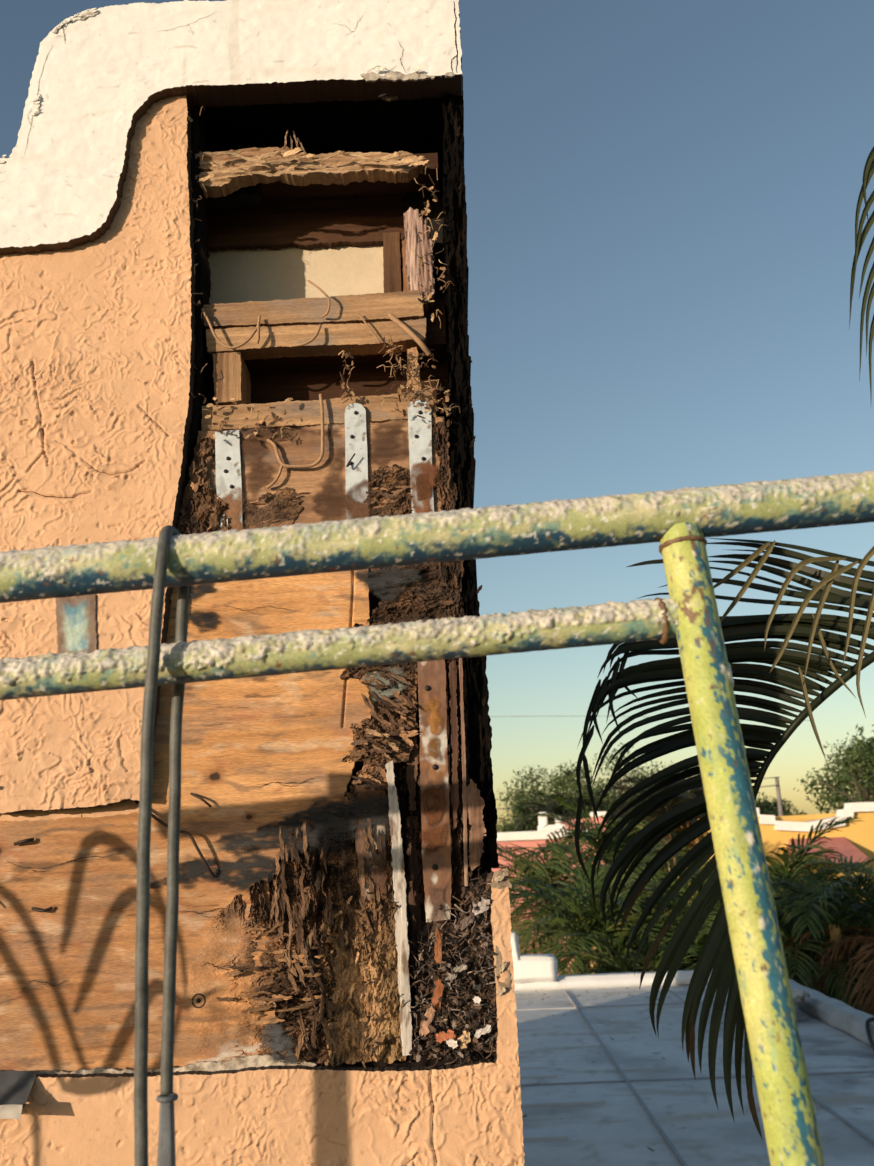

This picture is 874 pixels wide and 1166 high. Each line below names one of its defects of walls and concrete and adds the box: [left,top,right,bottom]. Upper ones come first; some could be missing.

spalling [207,369,215,405]
spalling [248,324,448,418]
peeling [191,461,205,493]
corrosion [410,459,438,513]
peeling [439,569,459,606]
peeling [348,726,370,757]
peeling [370,671,420,752]
corrosion [425,700,441,759]
peeling [358,763,397,790]
corrosion [421,786,446,854]
corrosion [429,888,445,918]
spalling [399,866,512,1069]